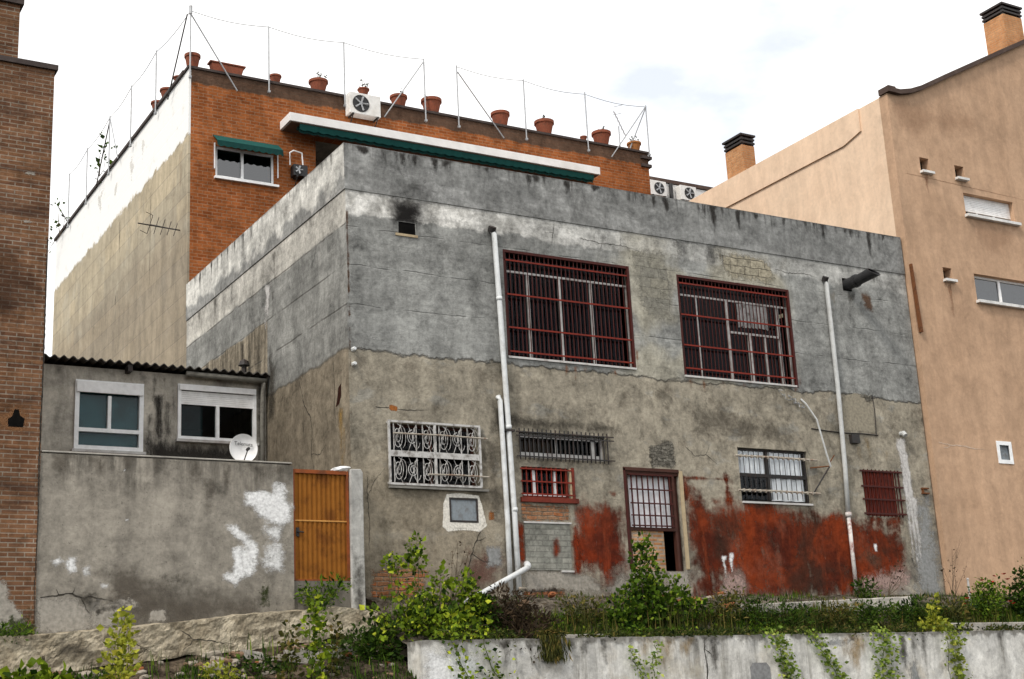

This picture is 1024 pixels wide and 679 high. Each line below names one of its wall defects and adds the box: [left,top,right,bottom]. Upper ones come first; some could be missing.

leakage [698,205,740,225]
crack [34,238,113,615]
flaking render [370,567,429,601]
peeling [518,493,628,597]
spalling [649,440,676,468]
efflorescence [896,438,921,561]